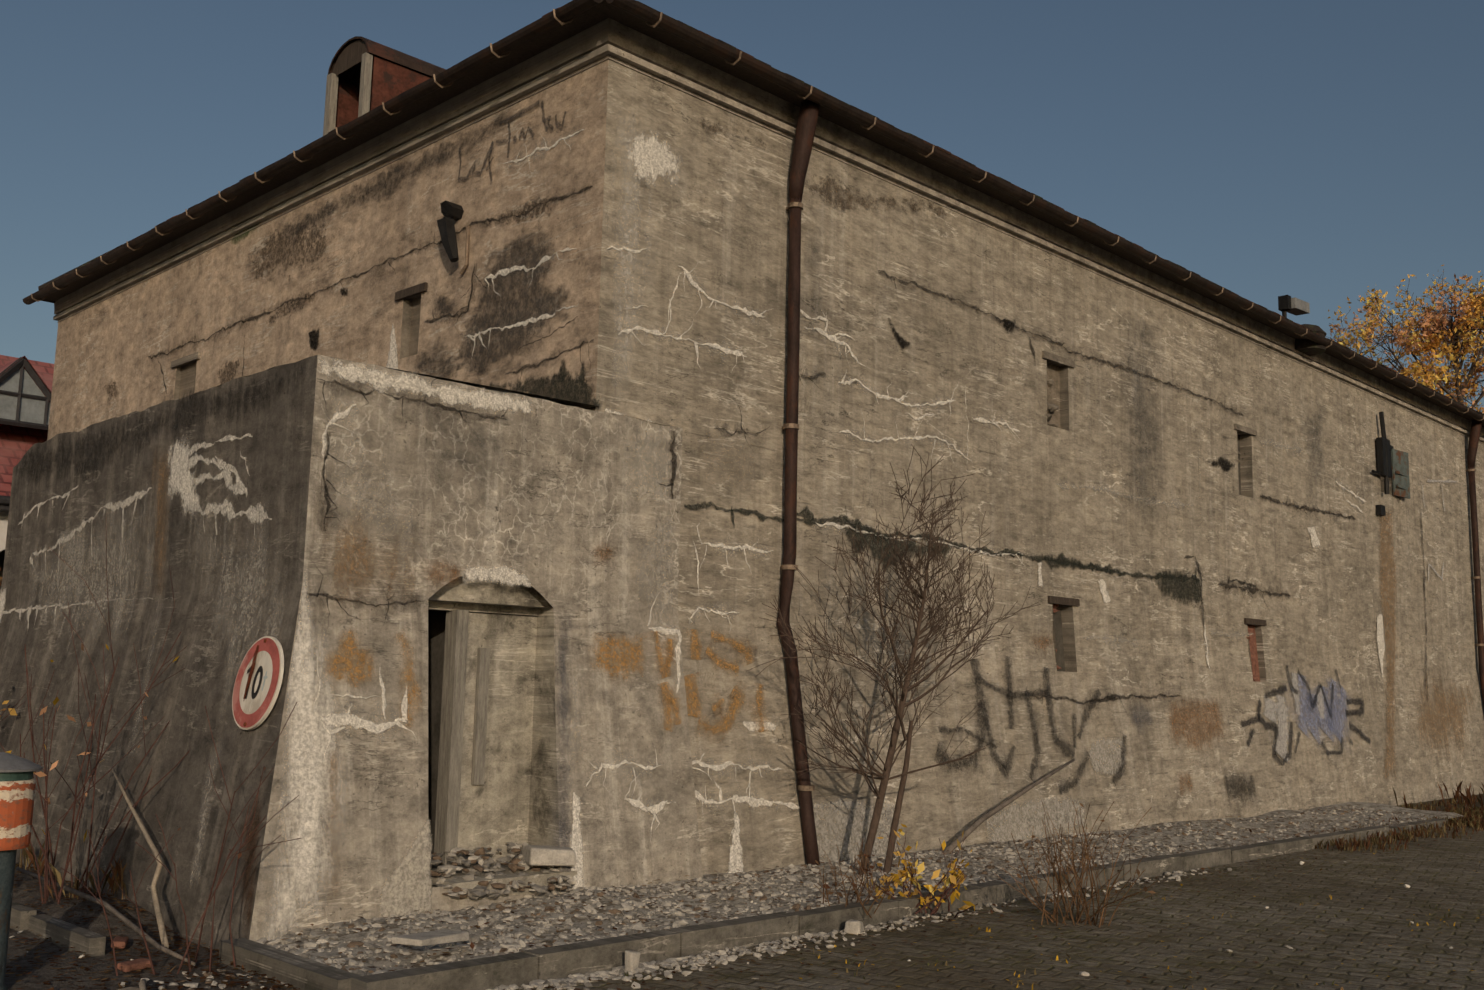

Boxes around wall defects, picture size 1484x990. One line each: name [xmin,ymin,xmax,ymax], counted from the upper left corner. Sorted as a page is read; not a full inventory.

water stain [319,233,566,413]
water stain [559,362,586,384]
crack [148,129,1020,529]
crack [2,433,272,628]
crack [303,568,429,623]
crack [647,523,773,693]
crack [817,516,1029,570]
water stain [1098,579,1111,603]
crack [585,721,800,840]